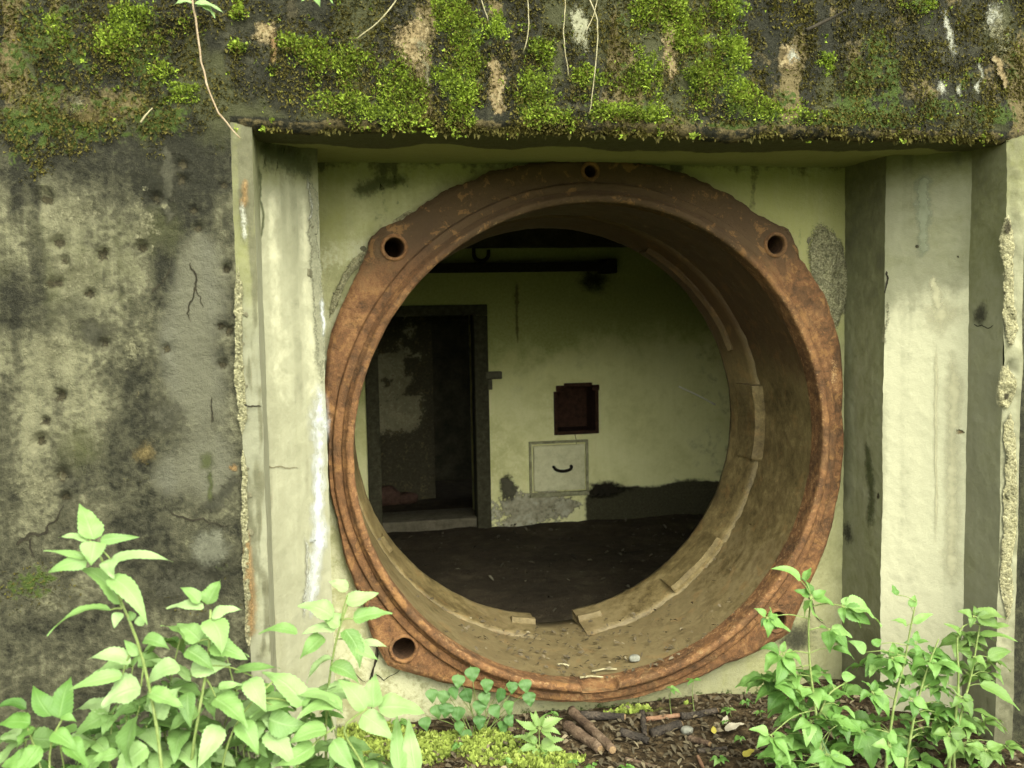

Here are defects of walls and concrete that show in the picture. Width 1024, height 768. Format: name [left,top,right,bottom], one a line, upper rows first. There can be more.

water stain [157,146,177,223]
crack [151,263,204,322]
spalling [807,224,847,329]
spalling [999,215,1019,346]
crack [16,505,64,558]
water stain [147,566,227,604]
water stain [203,456,239,510]
spalling [240,450,254,646]
water stain [303,393,327,615]
peeling [491,475,581,527]
spalling [996,365,1018,620]